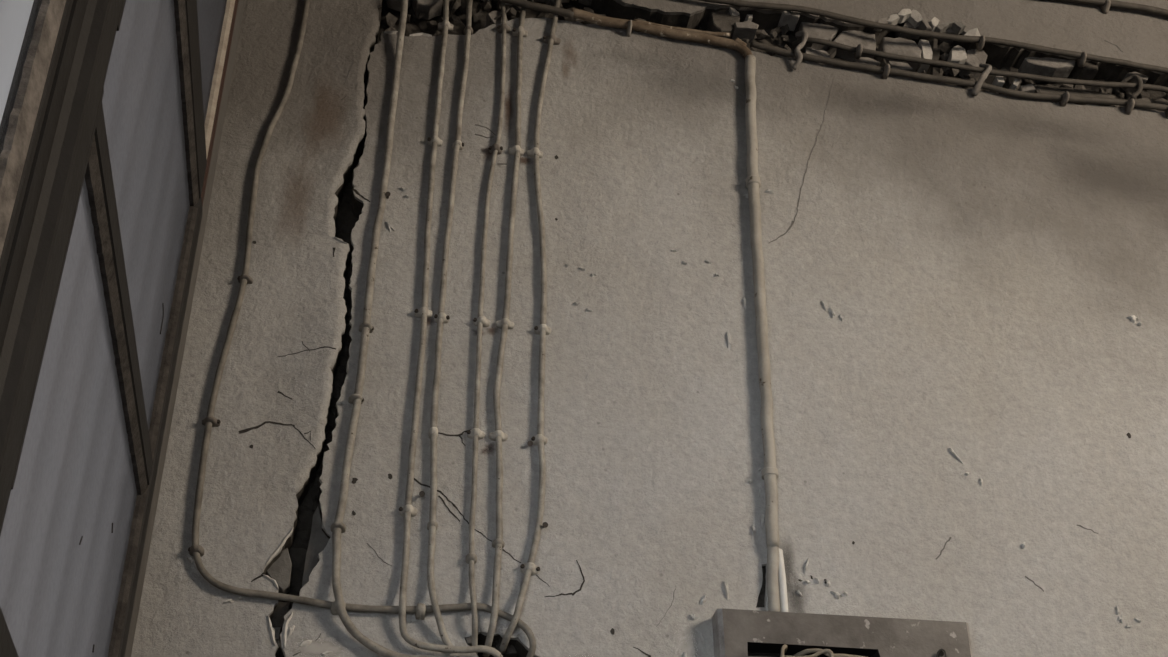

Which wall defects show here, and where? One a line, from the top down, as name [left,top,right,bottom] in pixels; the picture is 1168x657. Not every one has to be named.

crack [239,4,382,657]
flaking render [378,0,1168,112]